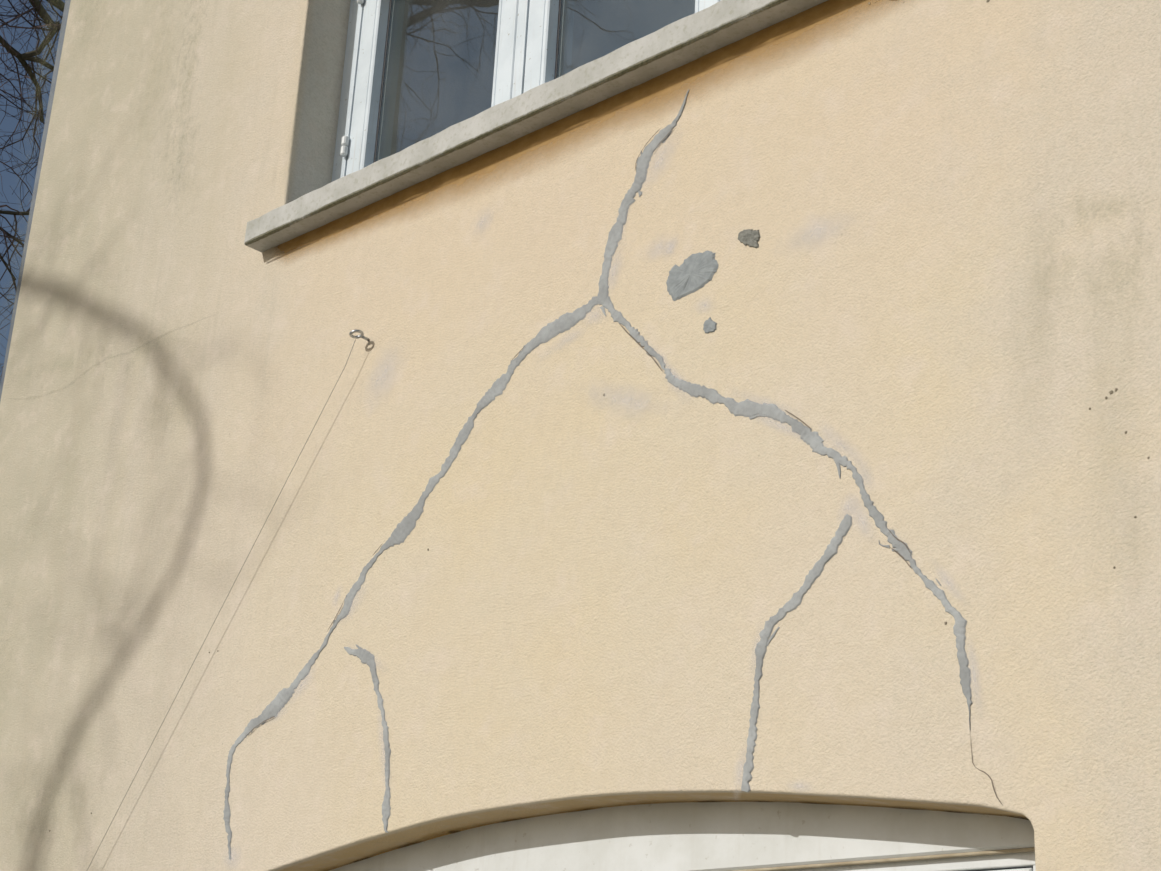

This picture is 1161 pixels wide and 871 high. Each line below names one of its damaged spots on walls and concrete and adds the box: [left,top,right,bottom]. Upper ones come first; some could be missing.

spalling [738,229,760,248]
spalling [666,250,718,301]
spalling [703,317,717,334]
crack [223,89,1002,860]